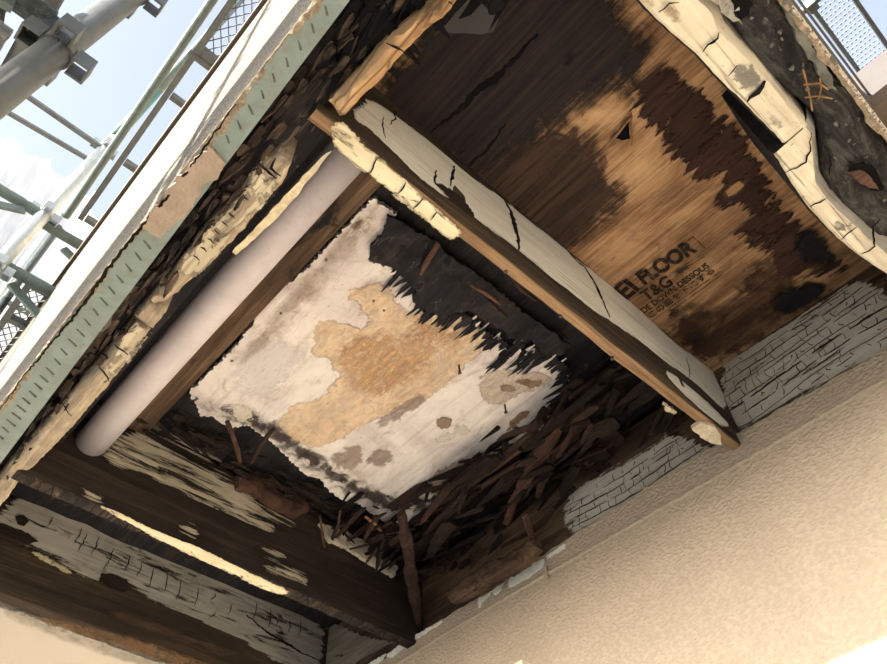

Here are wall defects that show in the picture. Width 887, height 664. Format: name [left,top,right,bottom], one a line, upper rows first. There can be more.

crack [747,80,766,102]
spalling [0,0,324,413]
water stain [220,282,493,512]
crack [398,123,506,220]
crack [502,197,520,250]
water stain [479,368,552,404]
water stain [507,411,530,431]
peeling [330,99,887,431]
water stain [669,262,831,361]
crack [723,287,887,429]
peeling [102,424,295,532]
peeling [0,488,404,664]